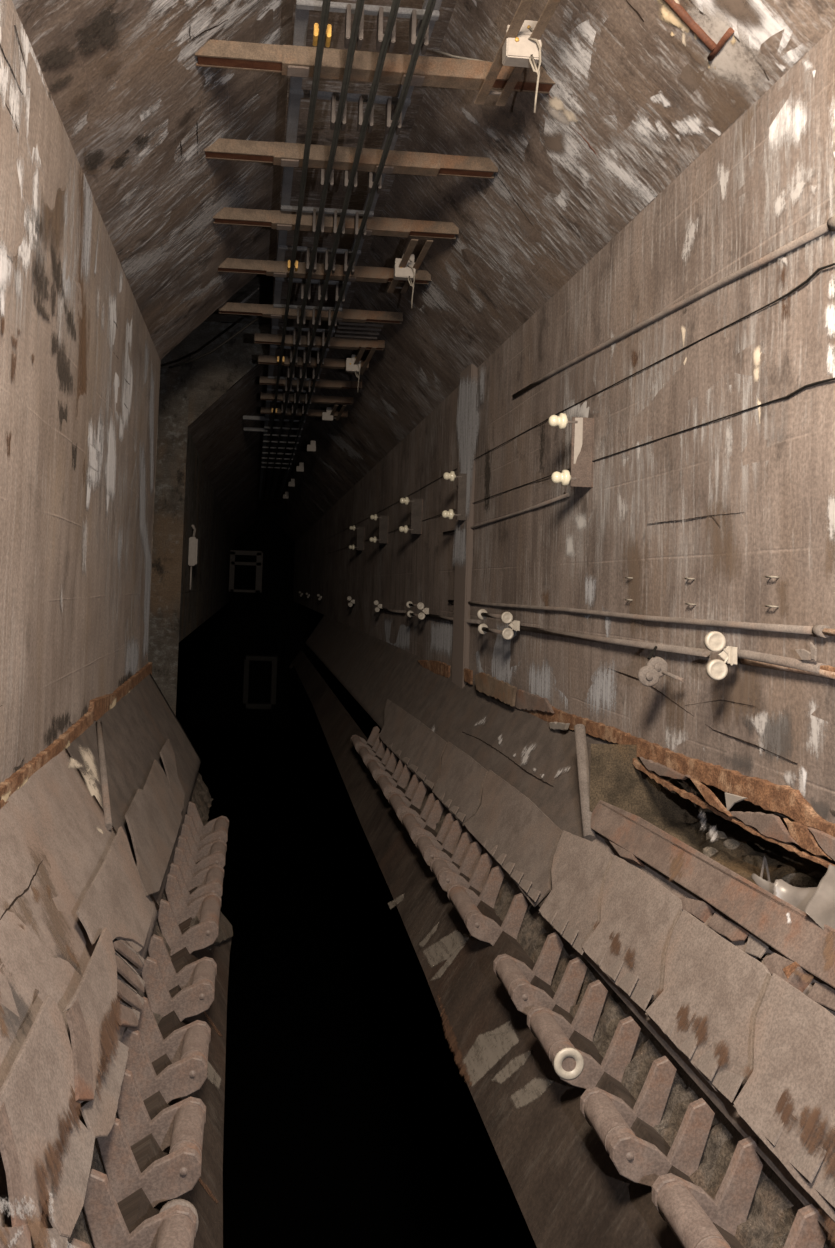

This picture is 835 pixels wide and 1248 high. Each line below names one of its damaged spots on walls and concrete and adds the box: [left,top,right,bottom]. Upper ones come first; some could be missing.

water stain [693,0,816,77]
water stain [0,0,168,424]
water stain [409,13,721,313]
water stain [754,100,834,245]
water stain [72,0,281,685]
corrosion [0,662,152,809]
corrosion [418,660,835,869]
crack [682,780,697,796]
spalling [590,744,835,885]
crack [0,860,43,920]
corrosion [676,1005,729,1066]
corrosion [776,1091,835,1177]